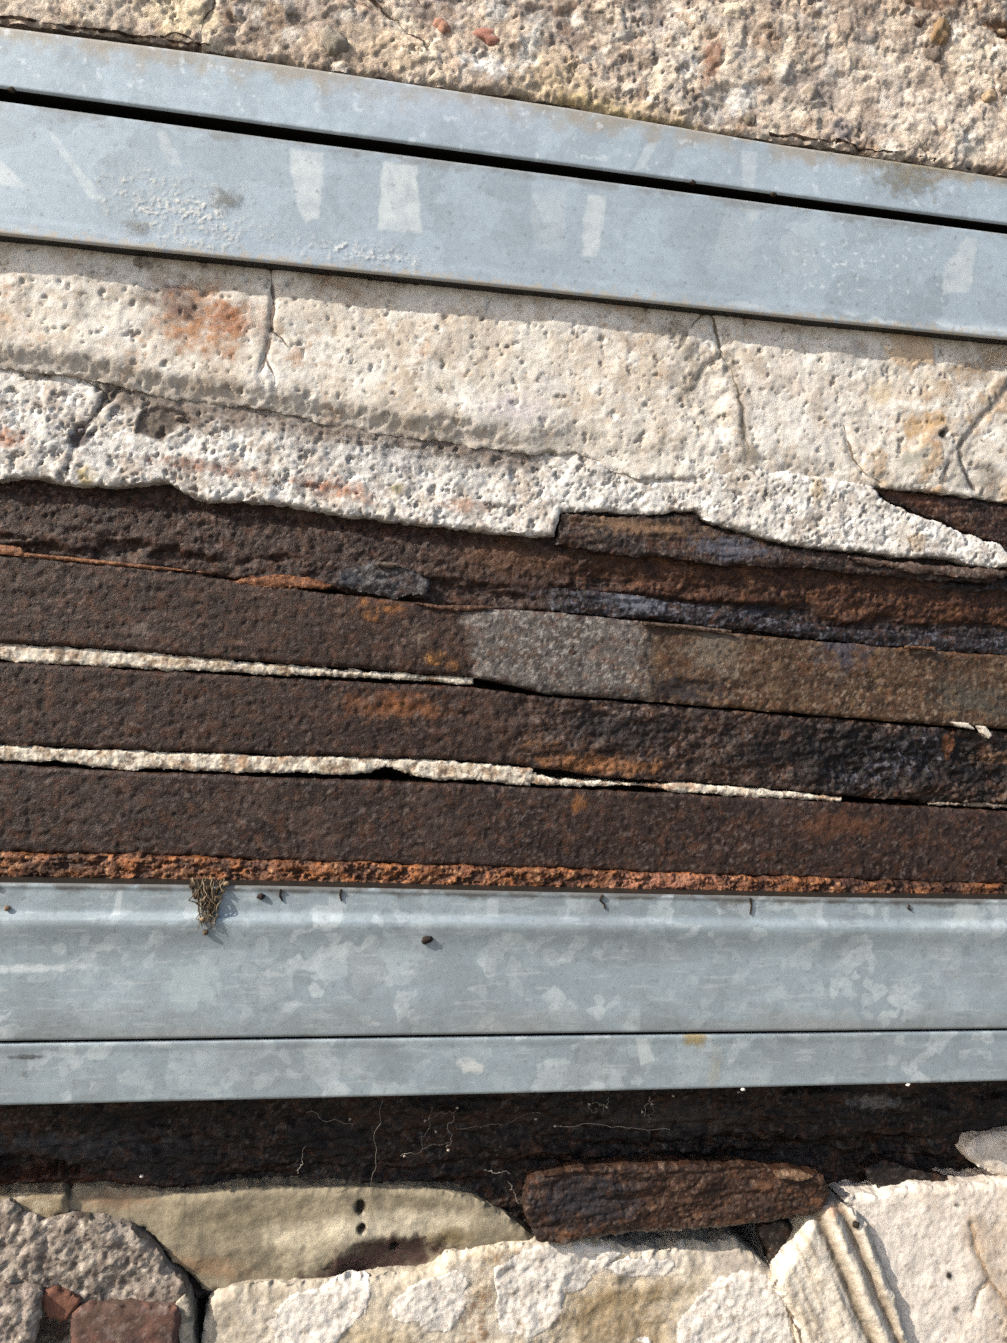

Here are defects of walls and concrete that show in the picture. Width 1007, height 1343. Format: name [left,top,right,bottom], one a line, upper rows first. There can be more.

crack [0,0,215,46]
crack [353,0,425,45]
corrosion [140,281,244,358]
crack [260,270,287,394]
crack [680,314,754,473]
crack [843,425,880,482]
crack [942,385,1007,489]
peeling [847,556,1007,579]
peeling [773,1169,813,1181]